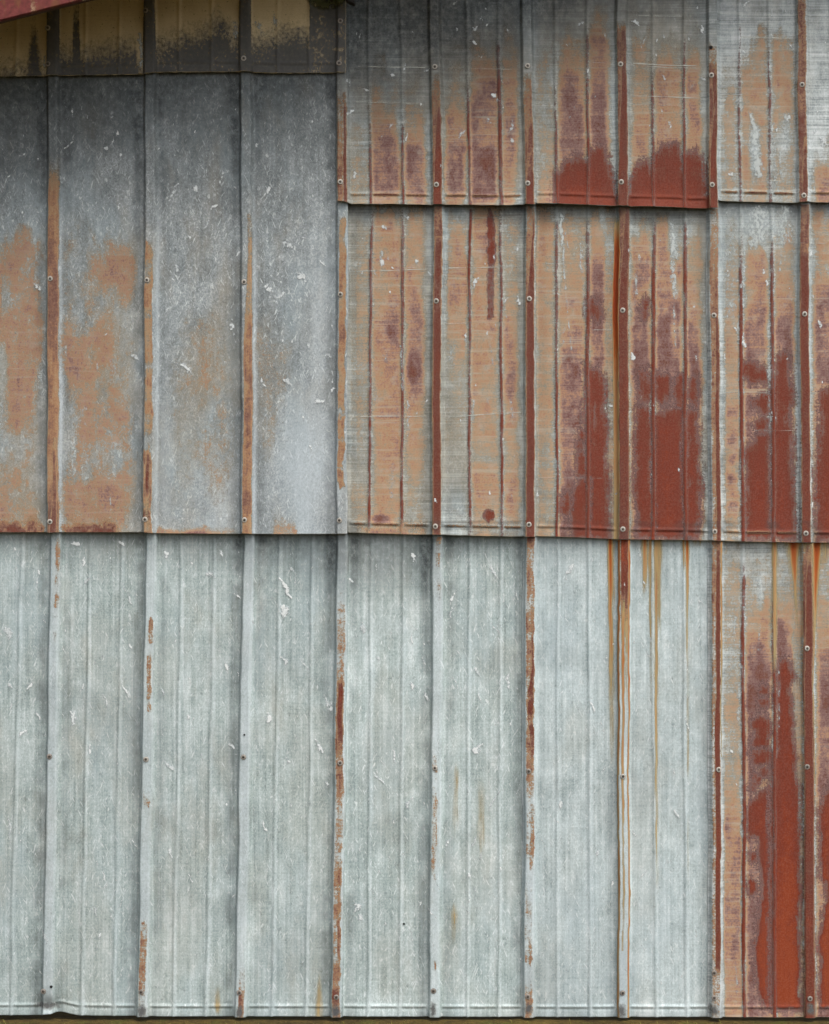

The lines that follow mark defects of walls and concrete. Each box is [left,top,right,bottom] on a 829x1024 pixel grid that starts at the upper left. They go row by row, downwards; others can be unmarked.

rust [0,169,285,608]
rust [337,0,829,1018]
rust [316,608,346,1017]